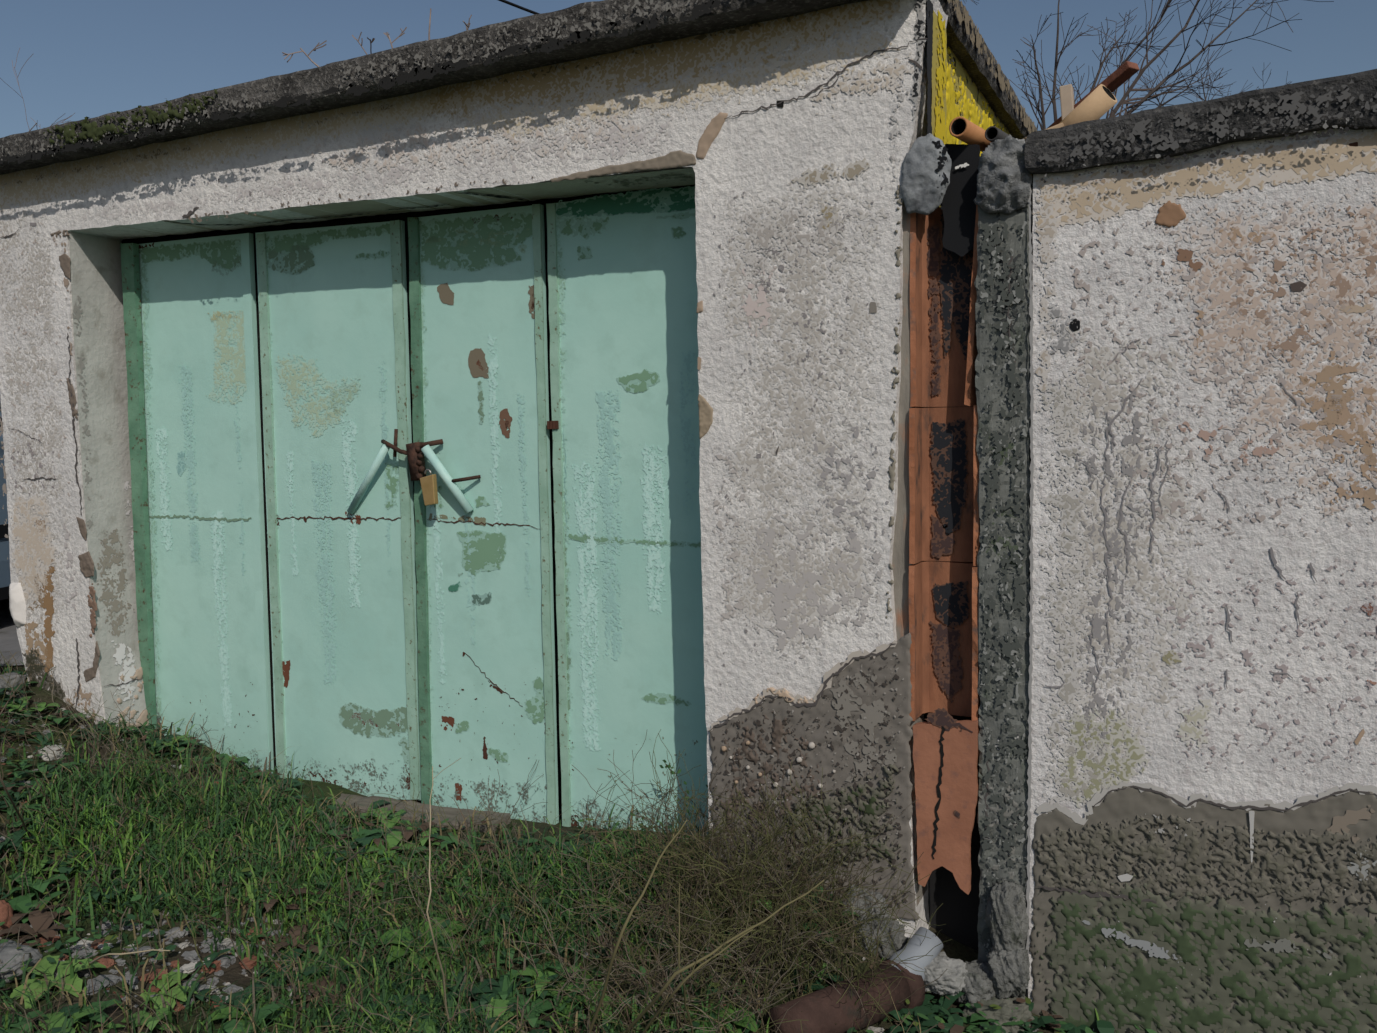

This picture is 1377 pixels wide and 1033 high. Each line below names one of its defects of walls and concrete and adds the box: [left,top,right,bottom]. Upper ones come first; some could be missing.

crack [724,38,928,119]
spalling [550,112,728,183]
peeling [176,156,383,223]
peeling [437,283,454,305]
peeling [468,348,489,378]
crack [1045,338,1169,694]
spalling [63,517,100,721]
spalling [984,196,1377,1016]
peeling [118,646,149,733]
rust [282,660,290,688]
spalling [708,633,920,920]